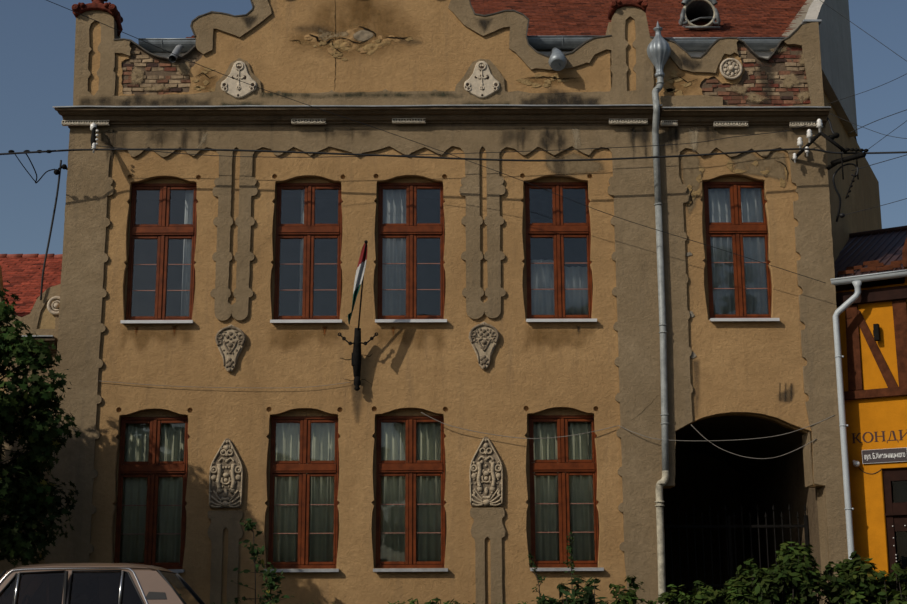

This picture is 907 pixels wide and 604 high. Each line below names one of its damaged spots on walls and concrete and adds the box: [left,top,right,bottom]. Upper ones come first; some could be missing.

flaking render [122,51,215,95]
flaking render [665,46,810,106]
water stain [542,128,602,175]
peeling [681,154,705,213]
peeling [726,152,789,188]